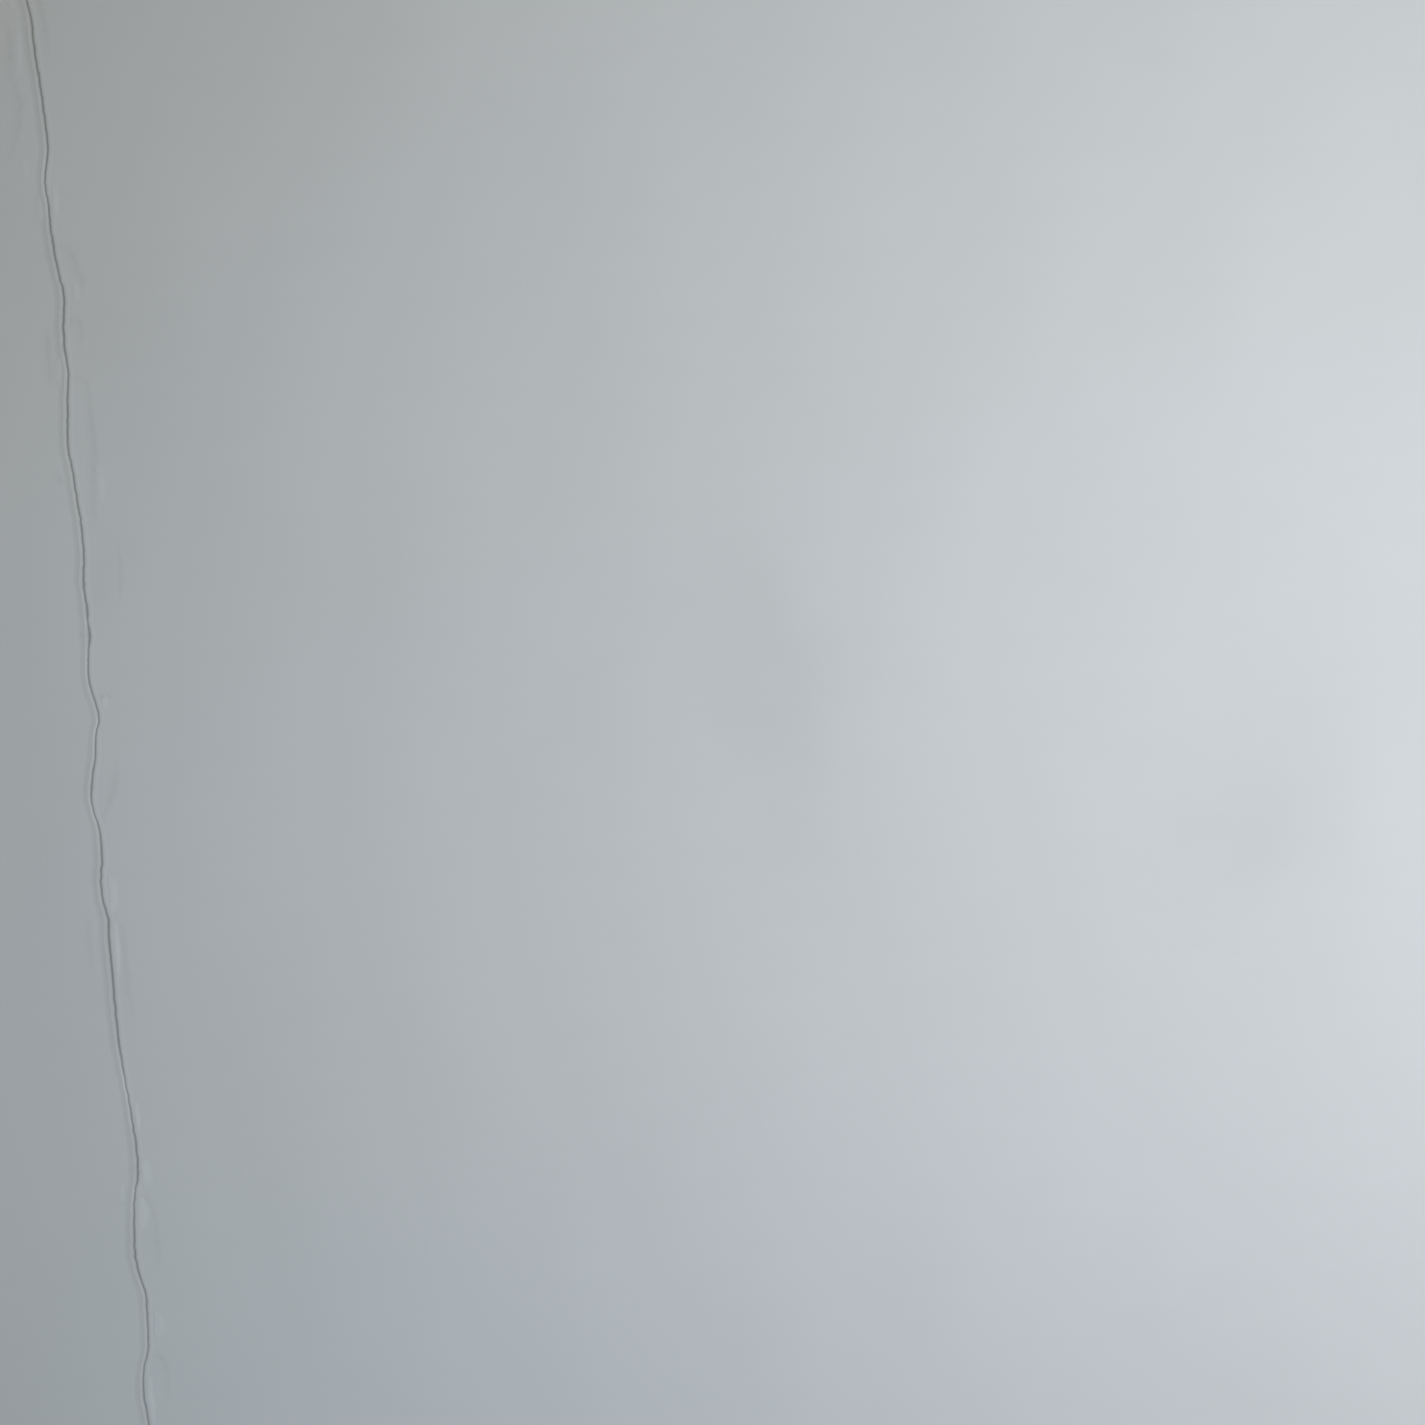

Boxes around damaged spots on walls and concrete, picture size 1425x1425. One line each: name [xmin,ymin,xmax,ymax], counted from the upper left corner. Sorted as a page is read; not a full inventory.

crack [2,0,174,1425]